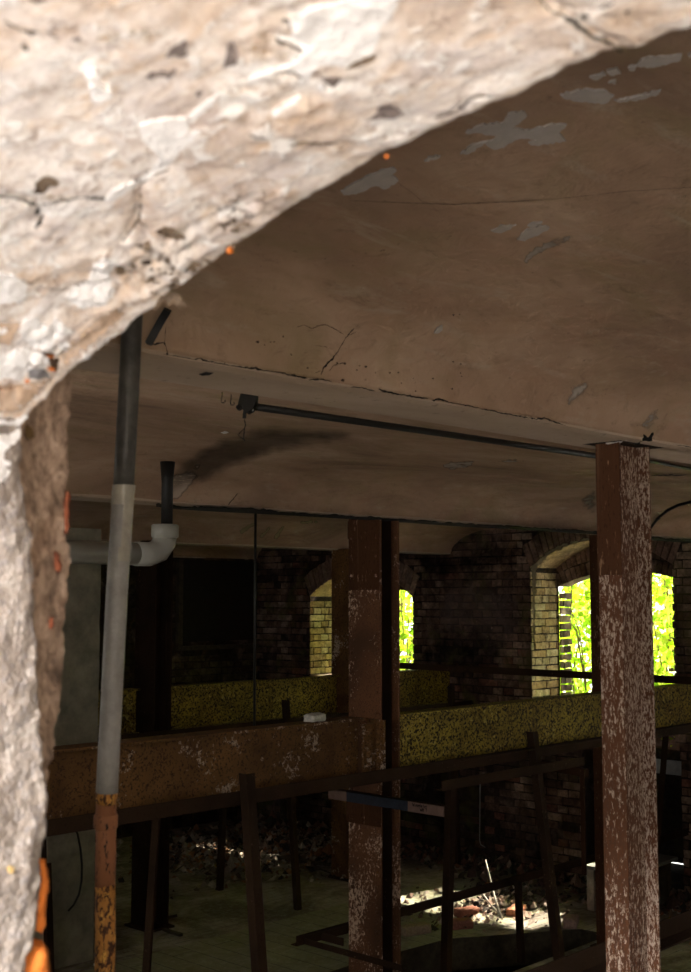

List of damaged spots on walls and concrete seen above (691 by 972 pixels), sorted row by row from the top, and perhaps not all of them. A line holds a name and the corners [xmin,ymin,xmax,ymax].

crack [540,0,623,52]
peeling [560,51,691,104]
peeling [460,110,567,155]
peeling [340,166,398,196]
crack [0,195,105,229]